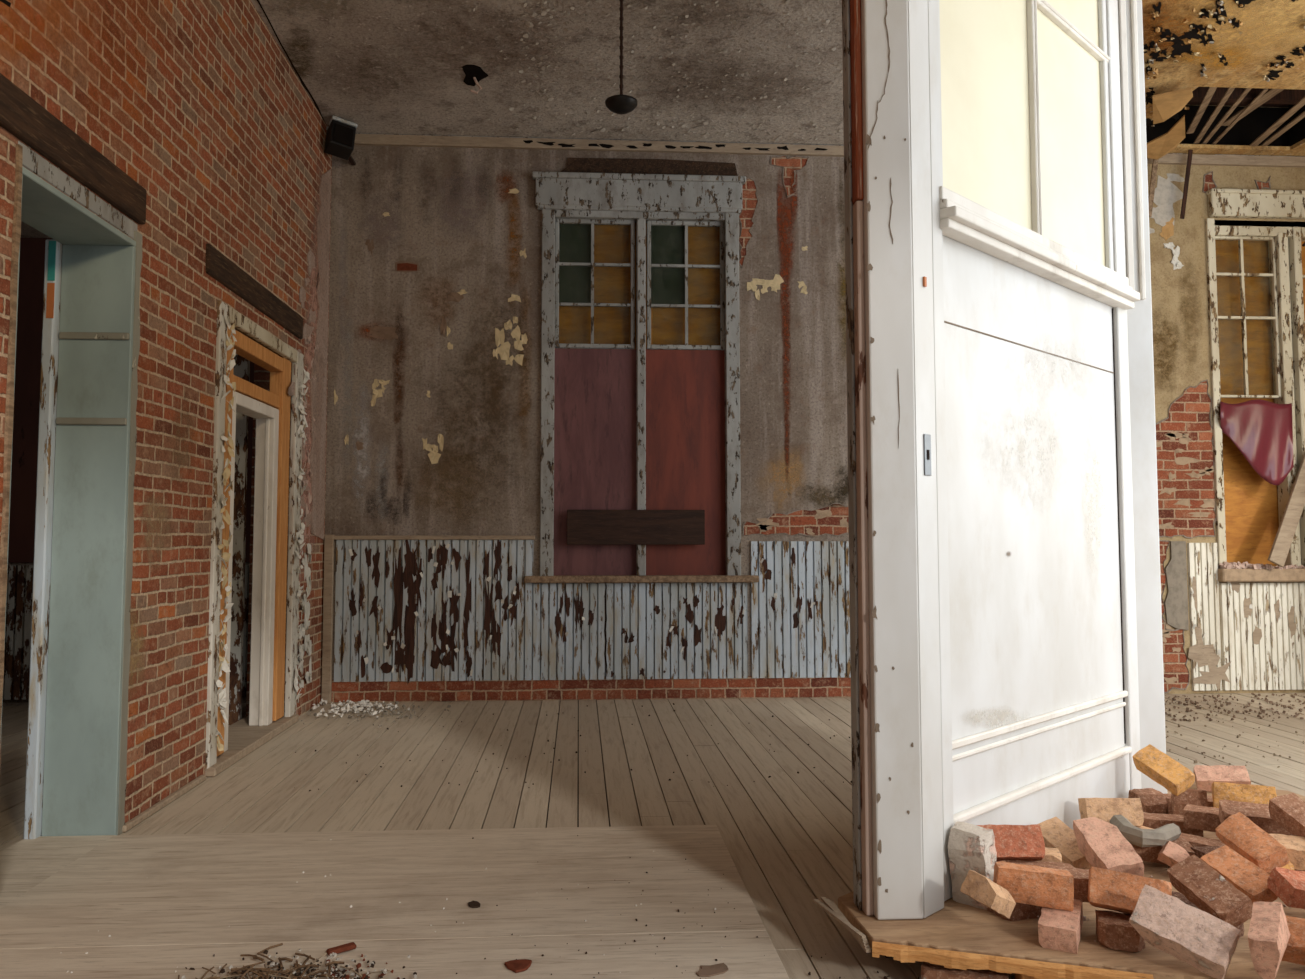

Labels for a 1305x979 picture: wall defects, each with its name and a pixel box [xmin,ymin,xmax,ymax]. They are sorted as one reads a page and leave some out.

spalling [1143,0,1305,147]
flaking render [739,177,808,300]
water stain [393,316,404,422]
peeling [493,294,528,366]
rust [777,173,798,473]
flaking render [742,503,849,566]
flaking render [1156,379,1231,693]
peeling [349,540,519,683]
peeling [555,592,594,643]
peeling [666,594,745,660]
peeling [793,585,817,628]
peeling [1227,582,1262,645]